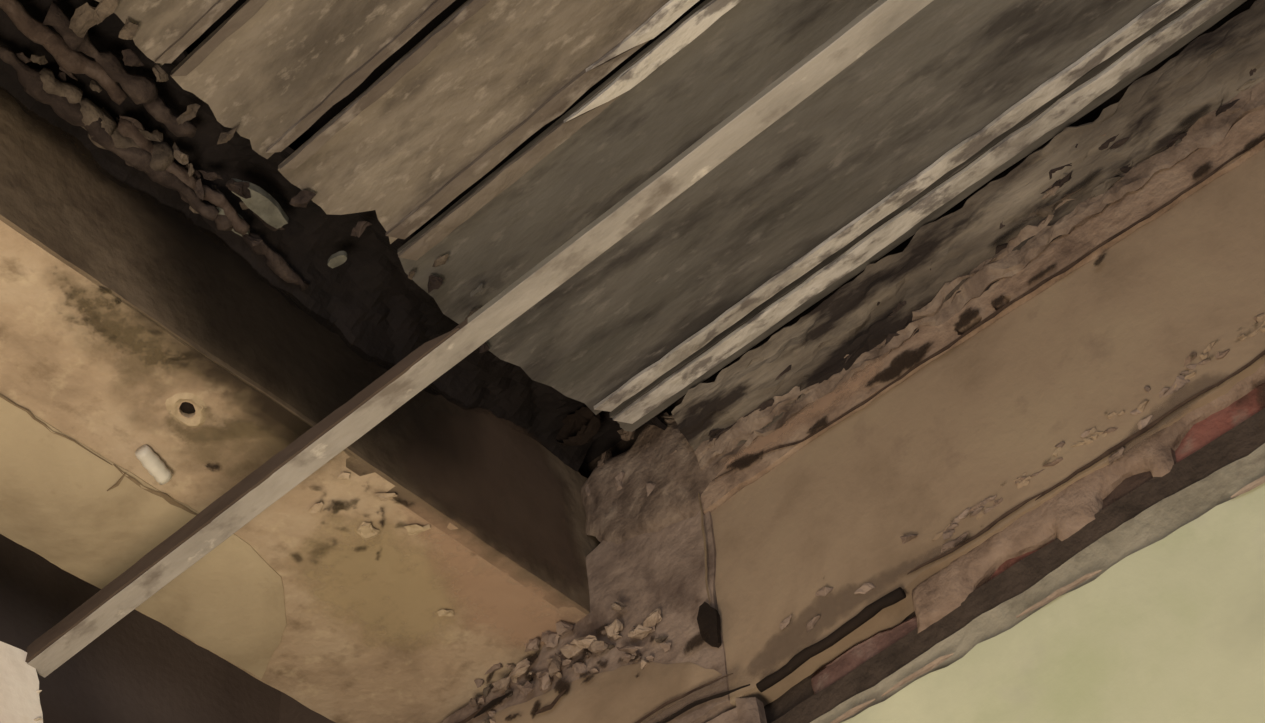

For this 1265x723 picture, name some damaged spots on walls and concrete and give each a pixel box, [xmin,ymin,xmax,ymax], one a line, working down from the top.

spalling [0,0,483,364]
spalling [432,0,1265,544]
crack [0,394,198,515]
spalling [900,495,1003,554]
flaking render [975,540,1054,590]
flaking render [756,583,917,694]